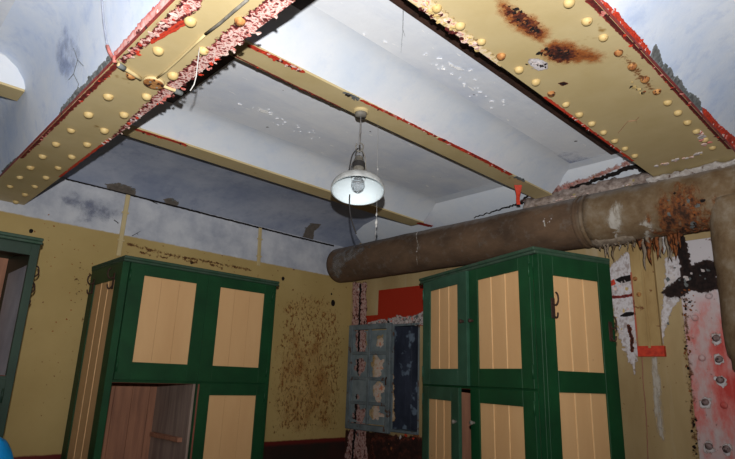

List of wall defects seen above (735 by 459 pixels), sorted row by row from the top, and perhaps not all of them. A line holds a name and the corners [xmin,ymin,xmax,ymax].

peeling [59,0,202,114]
peeling [99,0,305,149]
corrosion [499,3,602,63]
corrosion [622,56,652,95]
crack [474,195,529,218]
crack [569,165,647,189]
corrosion [636,182,715,270]
corrosion [274,296,342,436]
peeling [344,282,423,459]
peeling [610,252,638,375]
spalling [661,235,718,344]